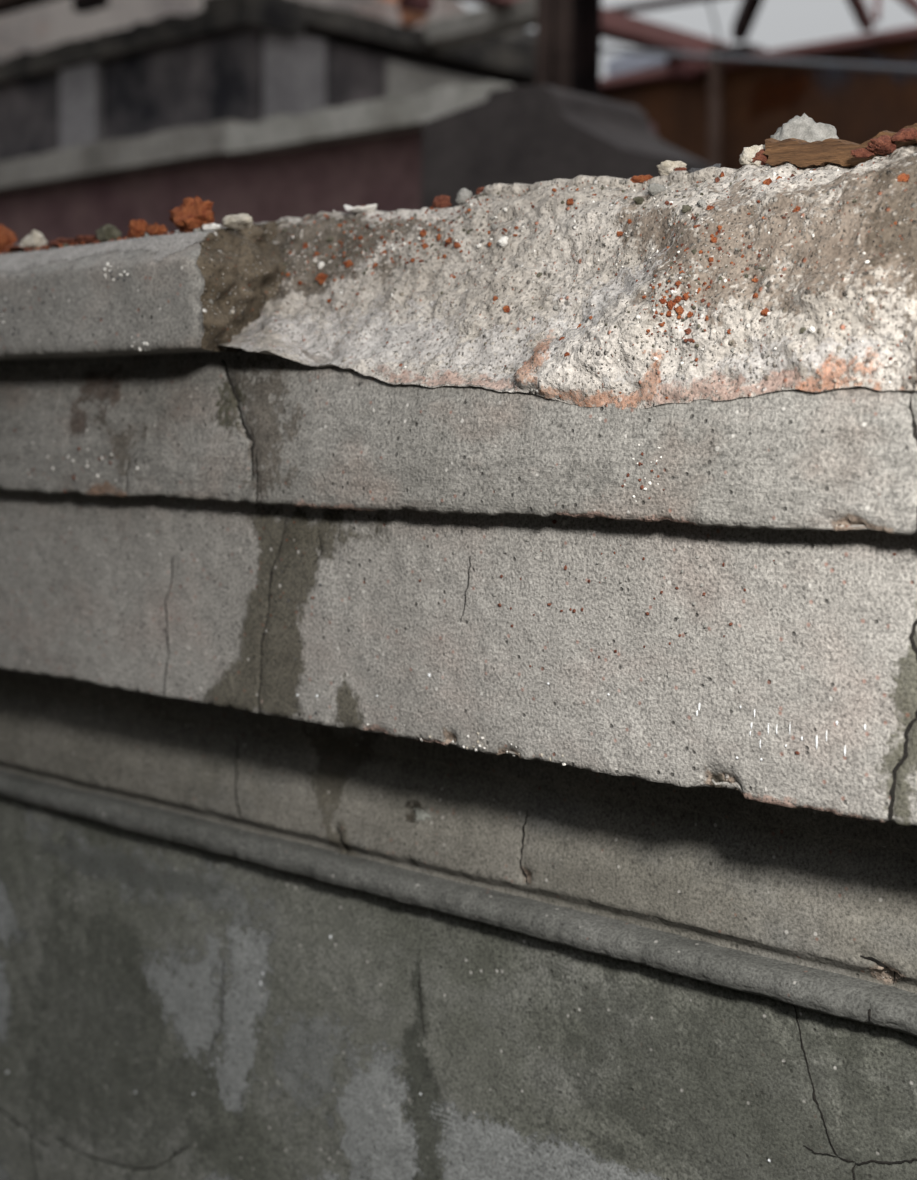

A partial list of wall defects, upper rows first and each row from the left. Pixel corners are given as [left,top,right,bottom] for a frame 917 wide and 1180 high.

spalling [196,145,917,410]
crack [221,359,259,503]
crack [909,380,917,440]
crack [258,519,286,710]
leakage [204,506,378,854]
crack [909,619,917,660]
crack [888,710,917,822]
leakage [0,882,29,1045]
leakage [24,809,663,1180]
crack [0,1109,189,1180]
crack [793,1005,917,1180]